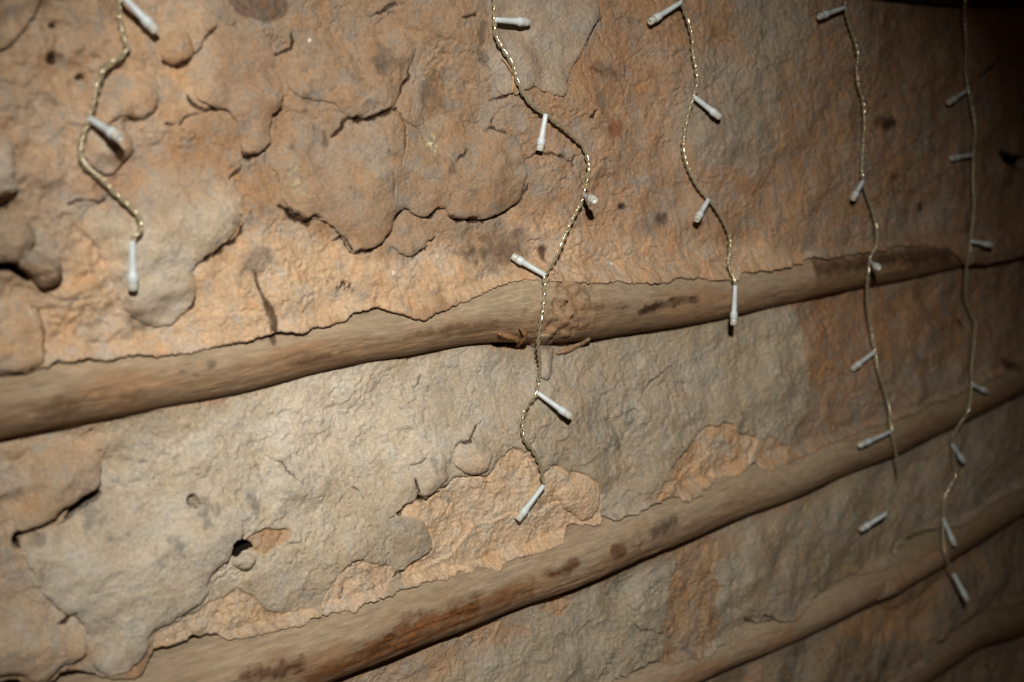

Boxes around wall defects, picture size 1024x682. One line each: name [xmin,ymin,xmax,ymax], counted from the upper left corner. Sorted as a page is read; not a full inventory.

crack [228,144,270,180]
crack [277,68,581,260]
crack [194,223,244,269]
spalling [657,423,785,502]
spalling [152,448,601,648]